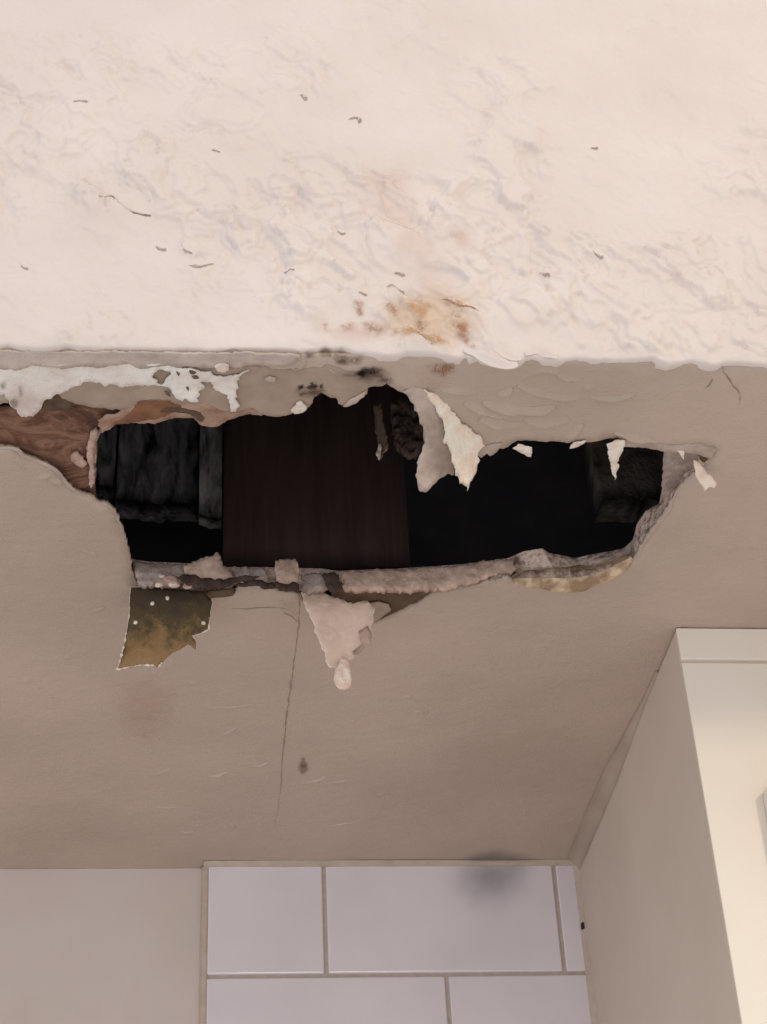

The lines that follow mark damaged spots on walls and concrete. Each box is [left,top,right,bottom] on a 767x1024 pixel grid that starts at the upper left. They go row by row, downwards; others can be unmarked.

peeling [0,349,387,473]
spalling [123,437,717,624]
crack [232,594,300,827]